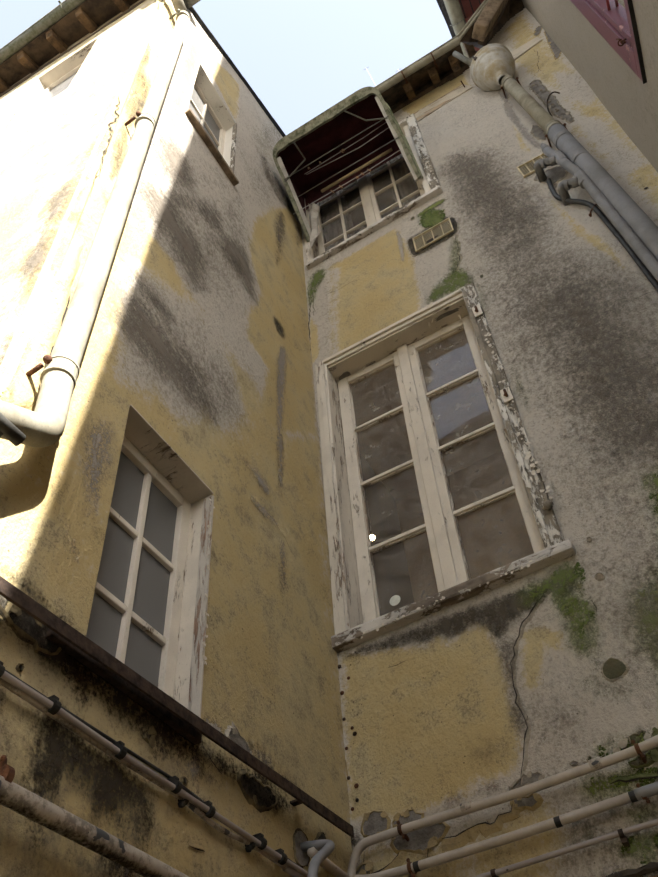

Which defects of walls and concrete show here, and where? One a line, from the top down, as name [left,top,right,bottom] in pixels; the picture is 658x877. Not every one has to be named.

crack [93,96,120,185]
spalling [528,79,575,123]
water stain [144,139,220,285]
water stain [114,277,214,419]
peeling [511,400,552,500]
spalling [0,595,62,655]
water stain [353,590,545,681]
water stain [24,713,155,846]
water stain [0,597,288,813]
spalling [360,808,451,855]
crack [363,585,556,874]
spalling [508,770,545,812]